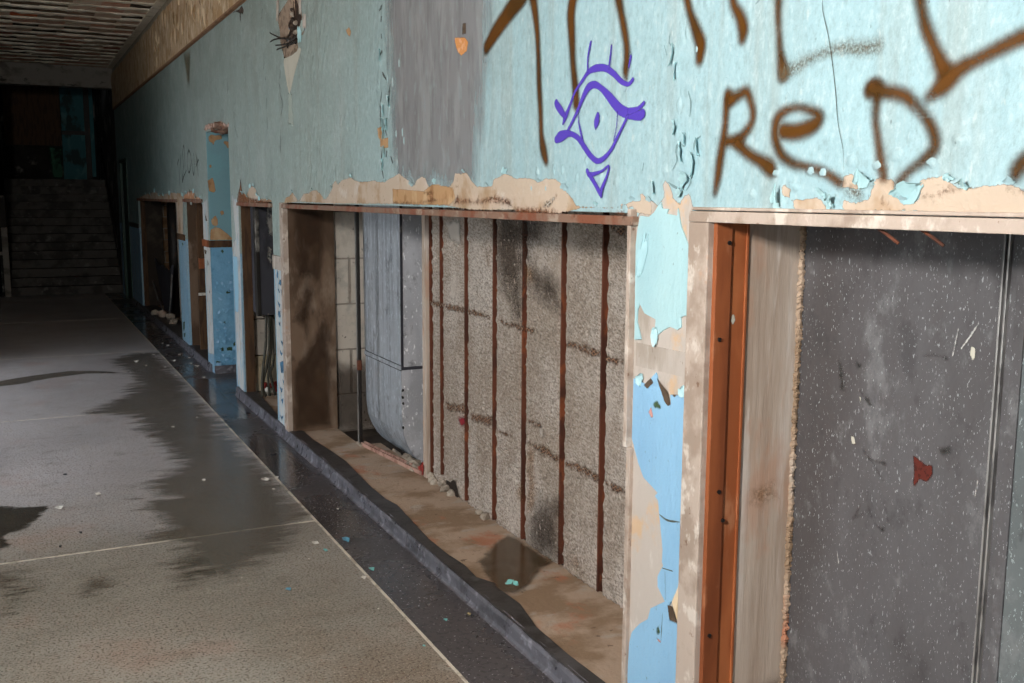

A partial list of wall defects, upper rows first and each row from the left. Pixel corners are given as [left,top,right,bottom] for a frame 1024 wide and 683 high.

spalling [270,0,306,58]
peeling [377,127,388,148]
peeling [769,168,1024,213]
peeling [140,165,605,391]
peeling [275,269,285,426]
spalling [343,429,415,459]
peeling [621,181,693,683]